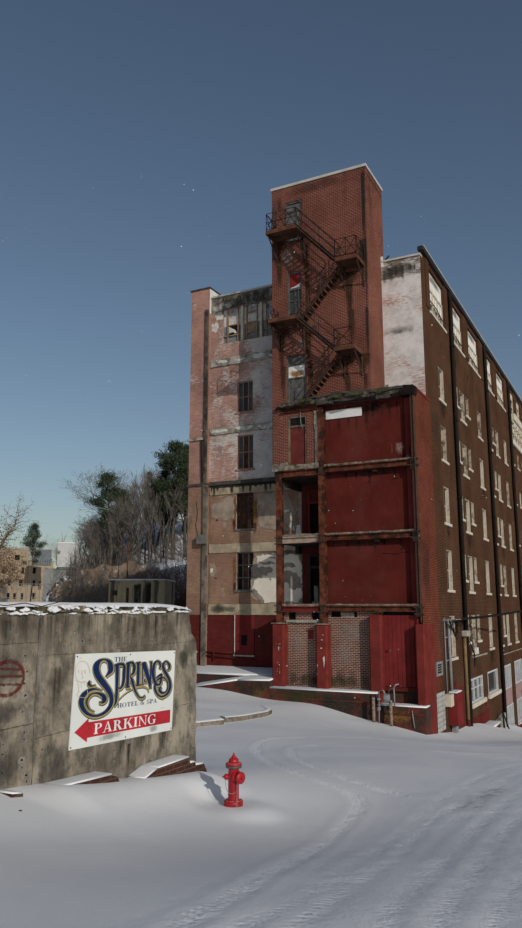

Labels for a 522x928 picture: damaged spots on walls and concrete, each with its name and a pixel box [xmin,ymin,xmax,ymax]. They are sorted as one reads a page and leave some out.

peeling [211,288,272,333]
rust [343,270,358,334]
rust [276,326,316,388]
flaking render [249,552,303,604]